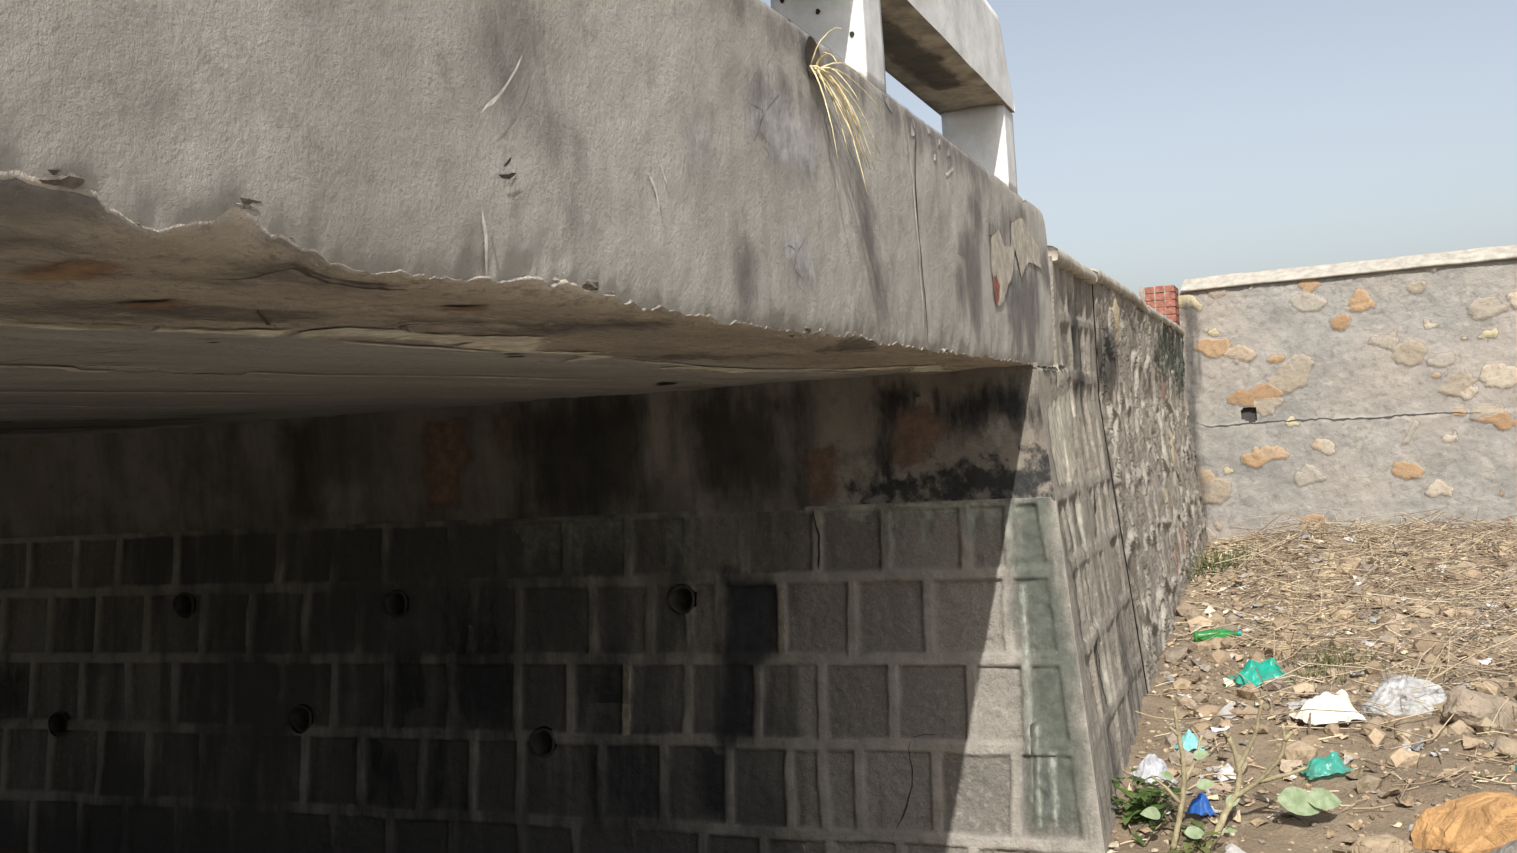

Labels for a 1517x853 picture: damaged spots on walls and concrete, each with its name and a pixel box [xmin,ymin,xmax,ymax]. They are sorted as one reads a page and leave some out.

flaking render [991,197,1041,306]
water stain [660,364,1042,450]
crack [1198,412,1480,427]